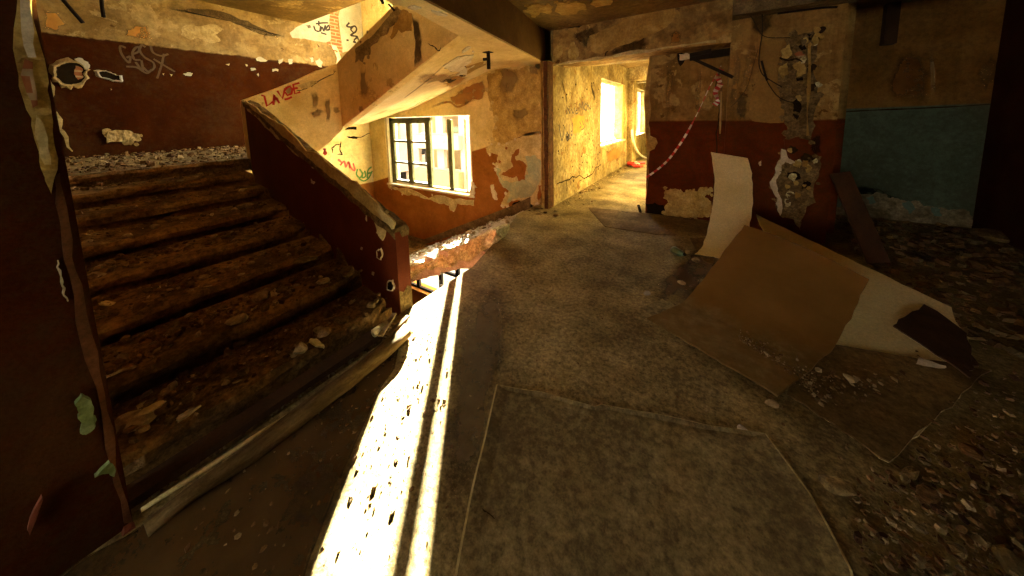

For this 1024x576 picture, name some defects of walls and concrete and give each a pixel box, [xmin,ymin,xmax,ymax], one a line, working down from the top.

peeling [246,57,293,76]
spalling [102,128,143,146]
peeling [443,46,542,208]
spalling [748,24,826,230]
spalling [661,186,714,219]
peeling [861,192,973,228]
spalling [13,0,136,537]